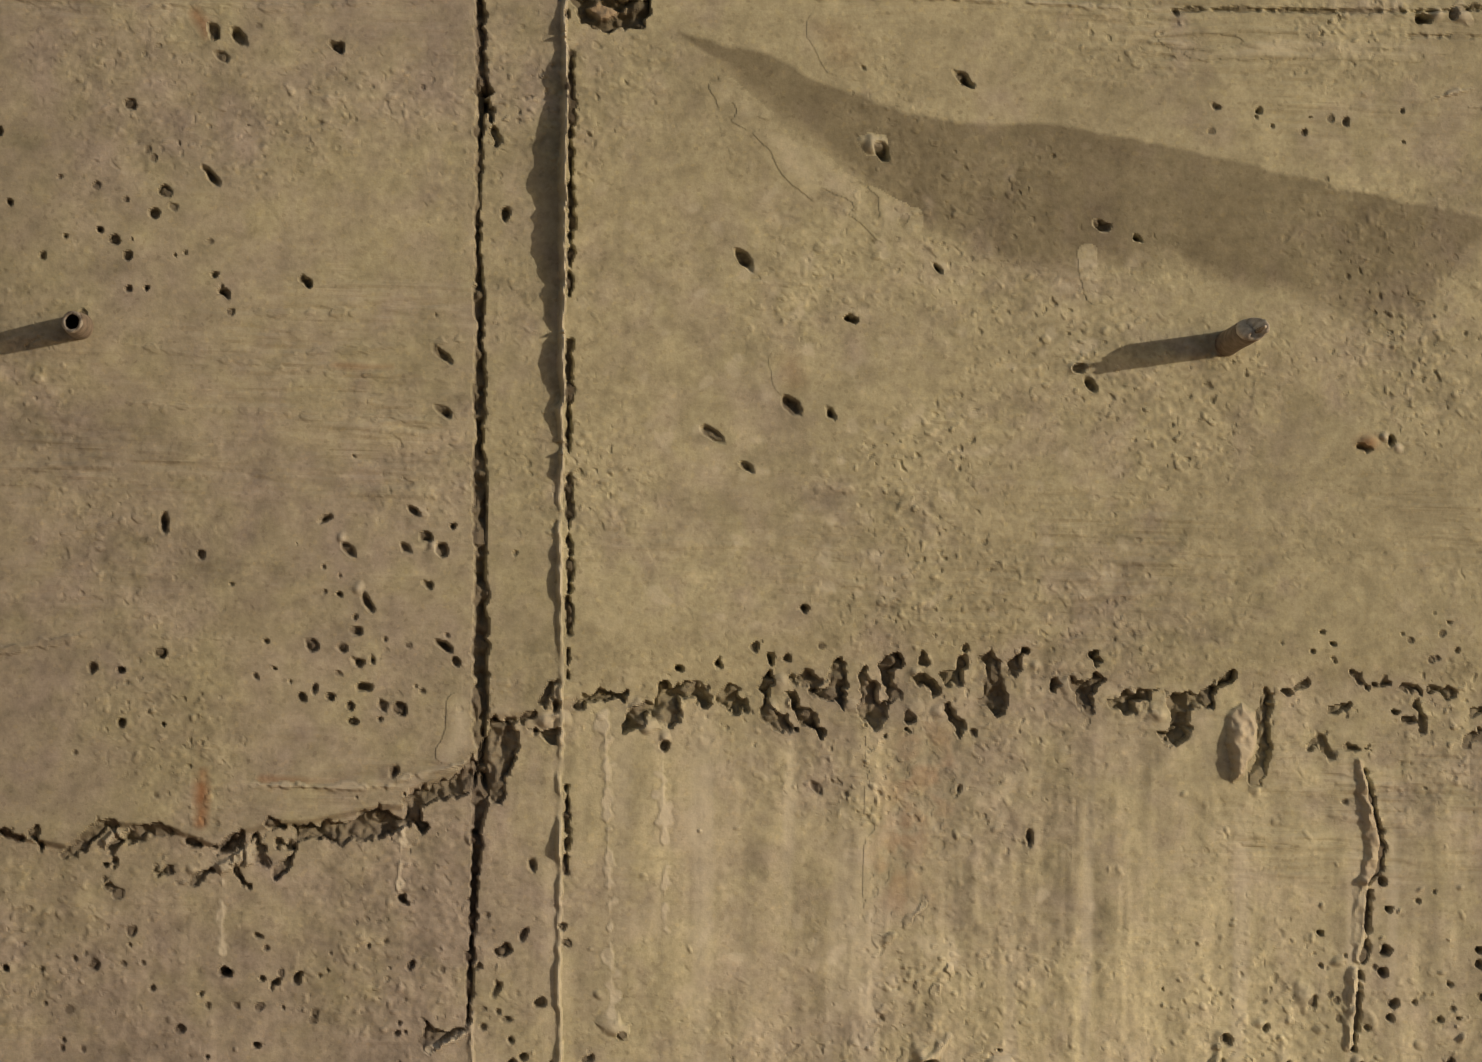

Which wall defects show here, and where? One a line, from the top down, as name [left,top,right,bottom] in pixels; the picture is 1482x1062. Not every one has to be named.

peeling [554,0,653,451]
spalling [316,512,334,525]
spalling [340,541,357,559]
spalling [397,504,450,559]
spalling [420,579,435,591]
spalling [297,590,408,727]
spalling [1305,668,1482,764]
spalling [25,639,1312,901]
crack [0,825,27,844]
spalling [492,926,530,959]
spalling [489,981,529,1062]
spalling [532,996,548,1010]